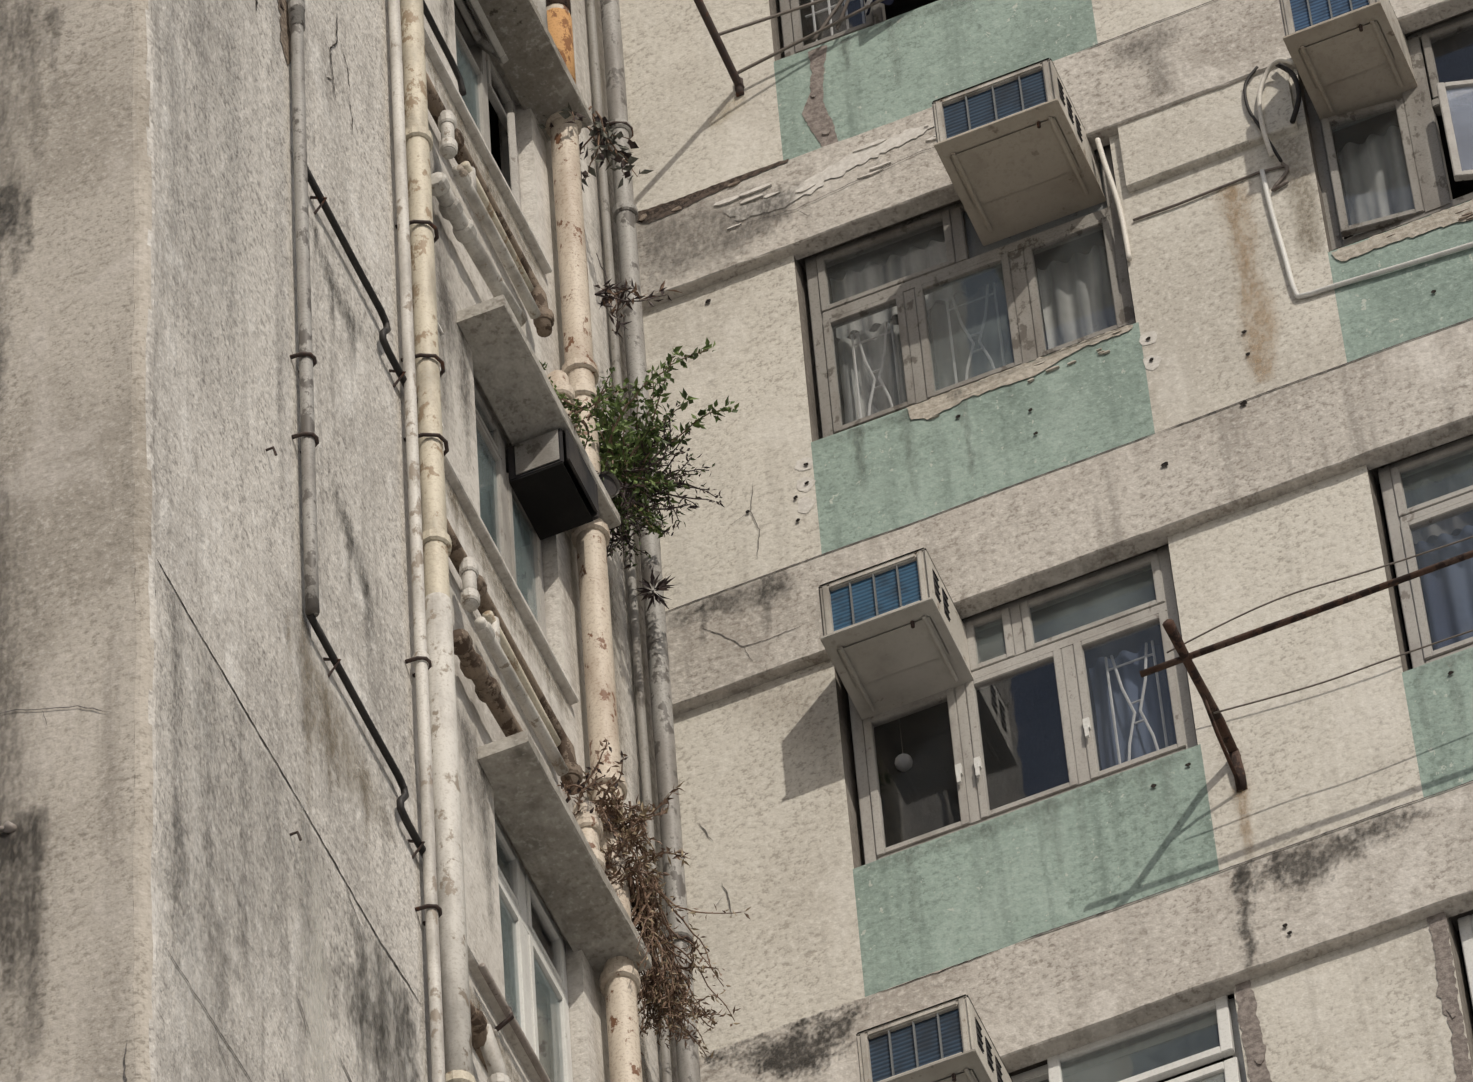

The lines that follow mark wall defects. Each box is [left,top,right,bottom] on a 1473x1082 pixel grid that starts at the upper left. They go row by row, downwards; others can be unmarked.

peeling [637,122,936,230]
peeling [907,325,1133,420]
leakage [6,814,38,955]
leakage [1233,812,1419,966]
crack [121,1040,129,1082]
leakage [352,937,408,1081]
leakage [706,1007,858,1077]